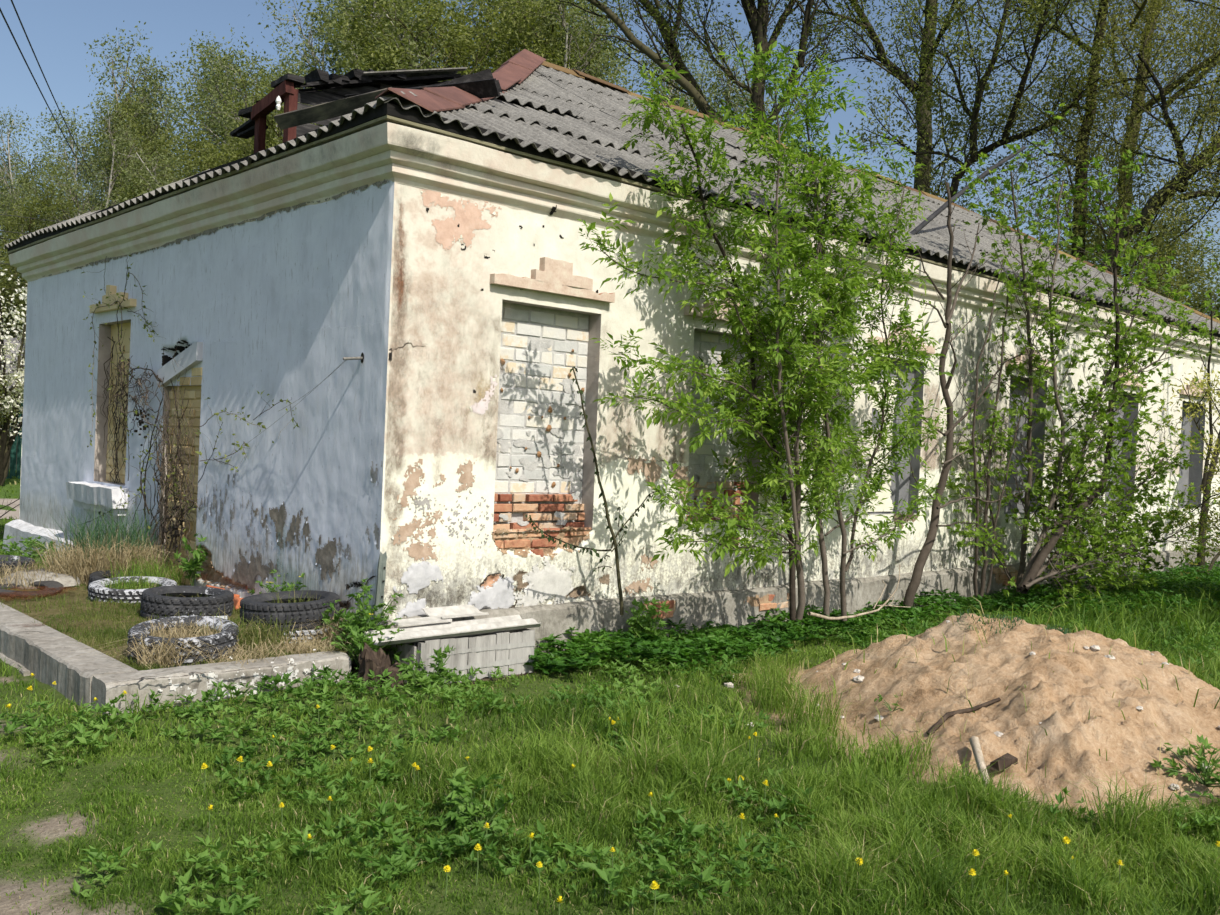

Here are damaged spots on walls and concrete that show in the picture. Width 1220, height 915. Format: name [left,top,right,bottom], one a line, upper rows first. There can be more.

peeling [421,189,502,250]
water stain [385,275,408,470]
peeling [195,472,363,610]
flaking render [366,459,596,594]
peeling [627,455,689,503]